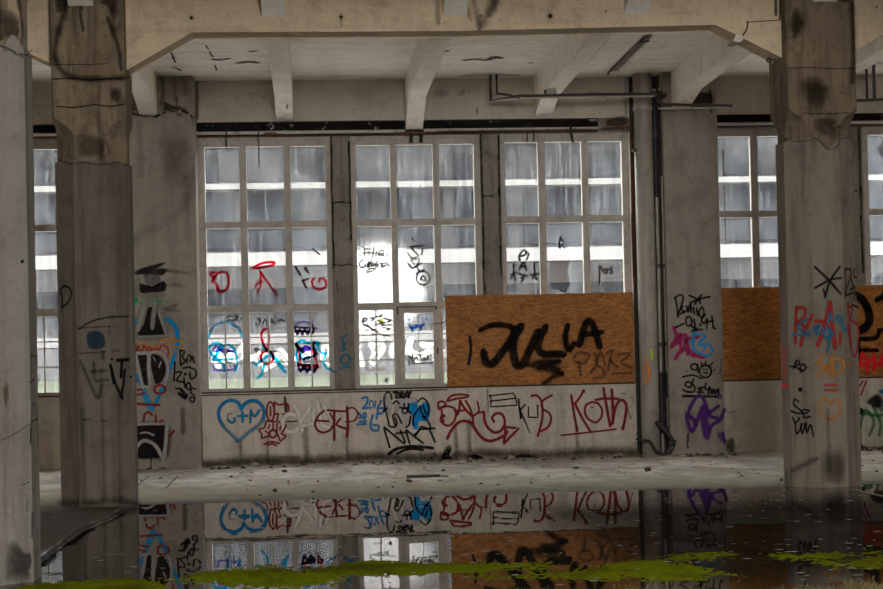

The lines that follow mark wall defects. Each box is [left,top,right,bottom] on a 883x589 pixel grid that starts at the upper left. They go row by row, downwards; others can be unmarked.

damp [845,0,855,85]
damp [805,81,827,102]
flaking render [132,100,195,126]